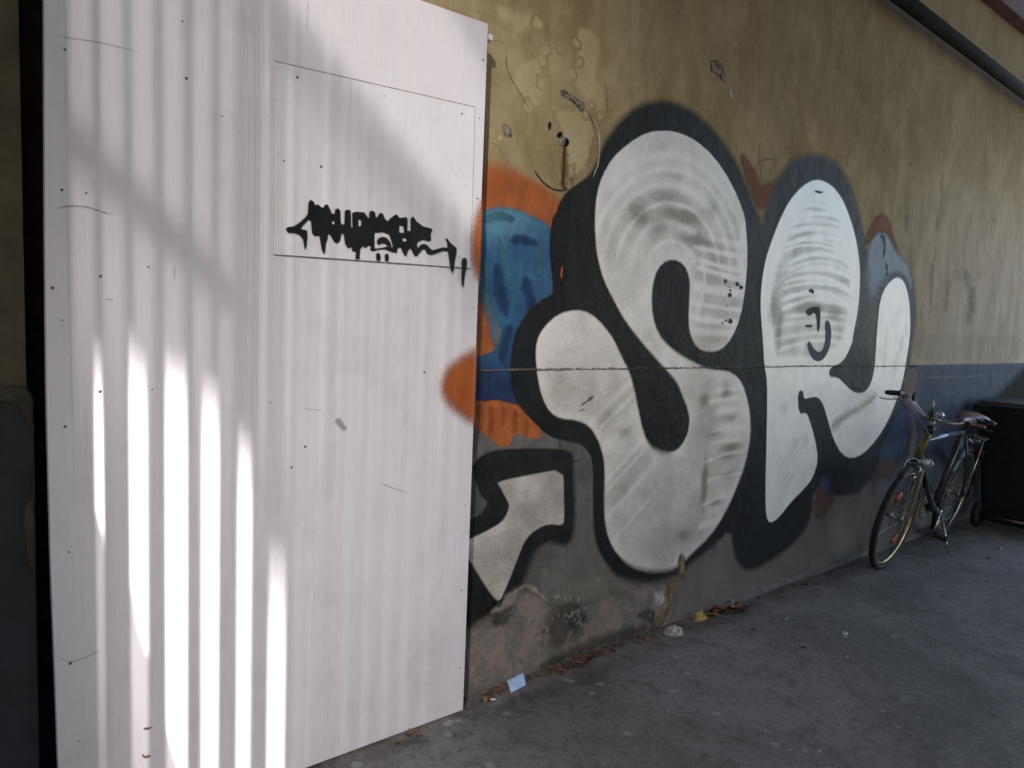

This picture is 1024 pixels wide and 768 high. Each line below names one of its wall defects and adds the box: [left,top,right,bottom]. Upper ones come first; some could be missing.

crack [476,364,919,372]